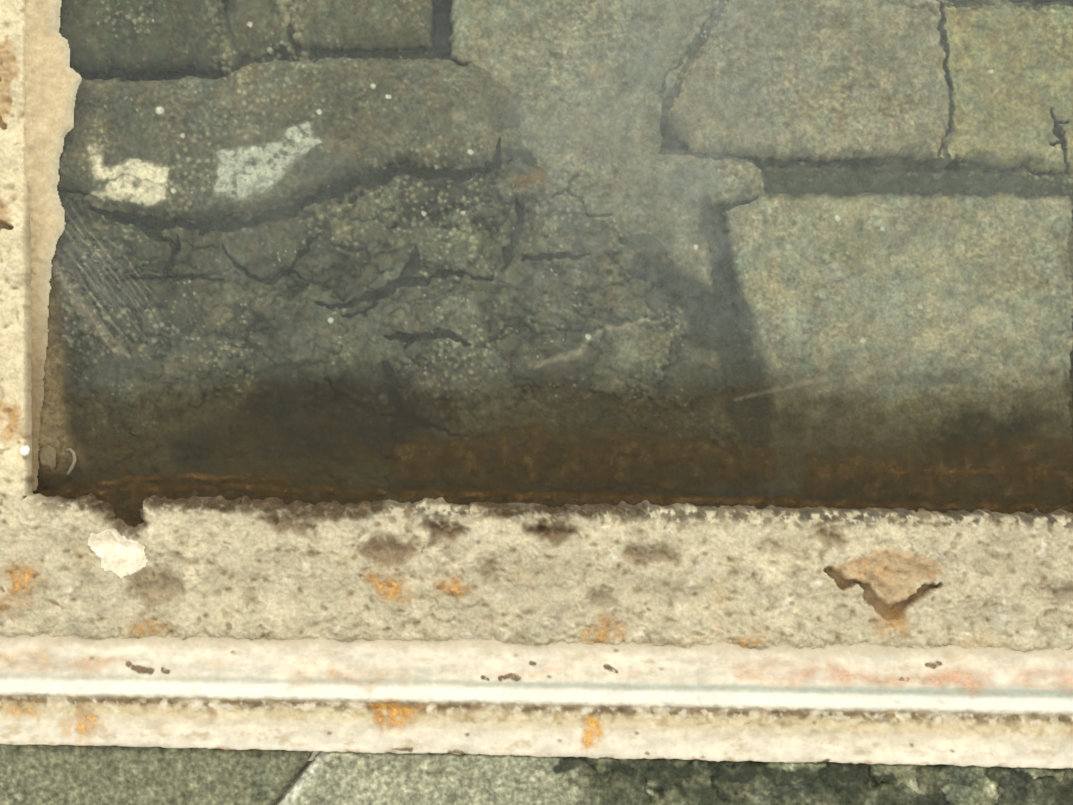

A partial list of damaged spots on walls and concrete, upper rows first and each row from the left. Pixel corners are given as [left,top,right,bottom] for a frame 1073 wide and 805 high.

spalling [0,35,23,131]
leakage [87,146,169,184]
leakage [214,122,322,199]
spalling [0,186,15,231]
spalling [352,509,512,588]
spalling [521,514,583,551]
spalling [608,536,687,574]
spalling [799,517,947,623]